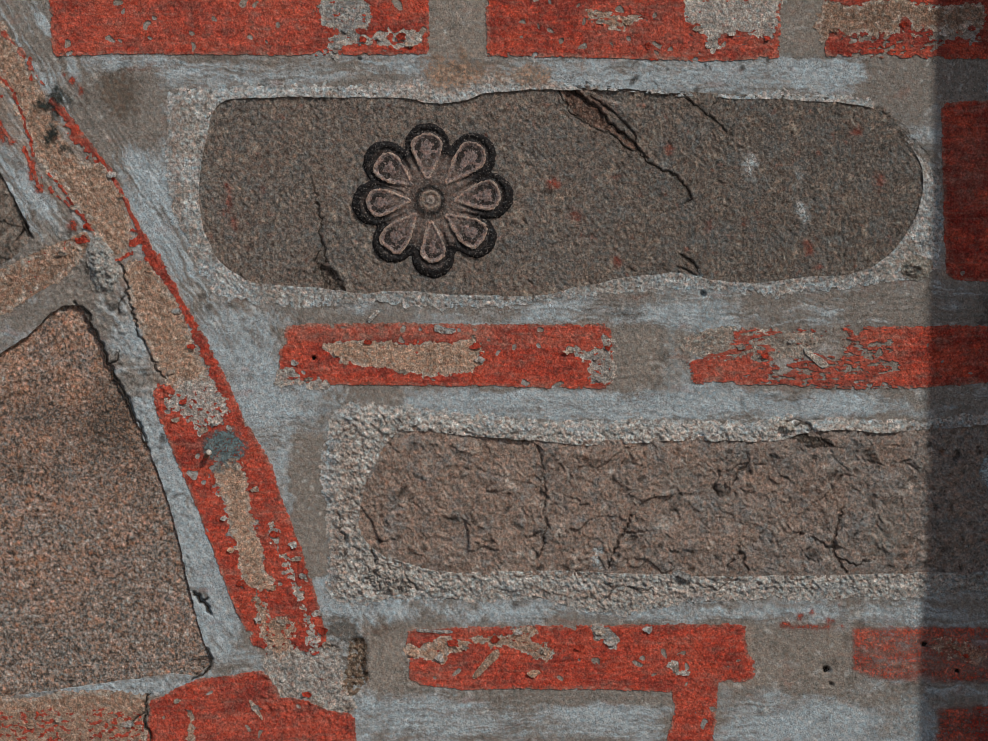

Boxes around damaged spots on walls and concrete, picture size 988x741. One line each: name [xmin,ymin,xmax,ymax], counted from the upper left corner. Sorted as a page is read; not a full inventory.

peeling [683,0,783,54]
peeling [813,0,987,43]
crack [558,78,692,203]
crack [685,98,725,131]
peeling [322,325,485,379]
peeling [563,333,618,385]
crack [789,419,837,448]
crack [529,449,549,558]
crack [601,516,648,602]
crack [809,507,874,573]
peeling [214,458,369,715]
peeling [402,625,555,679]